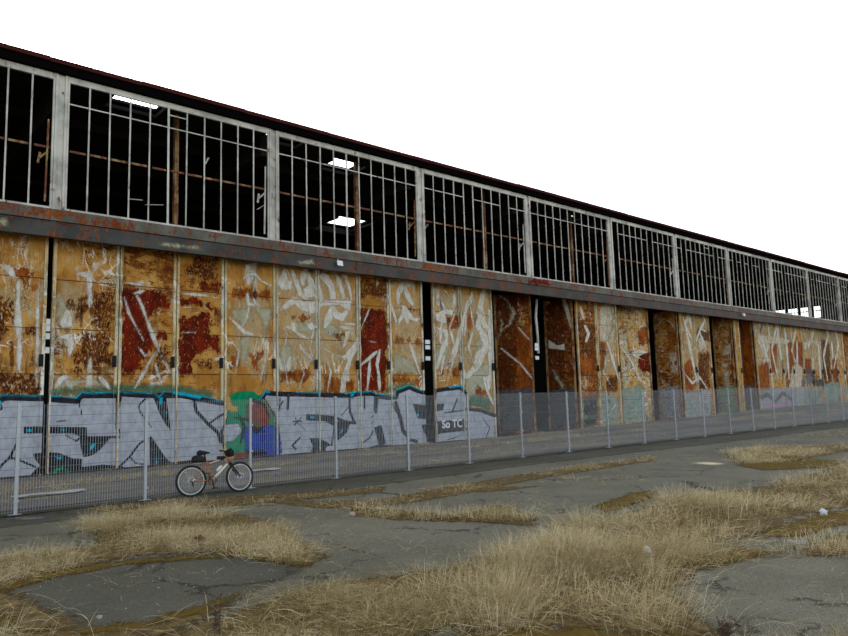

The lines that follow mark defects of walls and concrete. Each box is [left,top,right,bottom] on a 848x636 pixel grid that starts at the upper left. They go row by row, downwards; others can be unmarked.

rust [10,208,128,240]
rust [0,296,42,395]
rust [14,266,38,292]
rust [66,287,170,383]
rust [178,255,223,376]
rust [232,287,270,302]
rust [249,349,264,371]
rust [280,367,310,384]
rust [324,262,423,393]
rust [447,304,477,340]
rust [488,294,535,408]
rust [546,299,618,421]